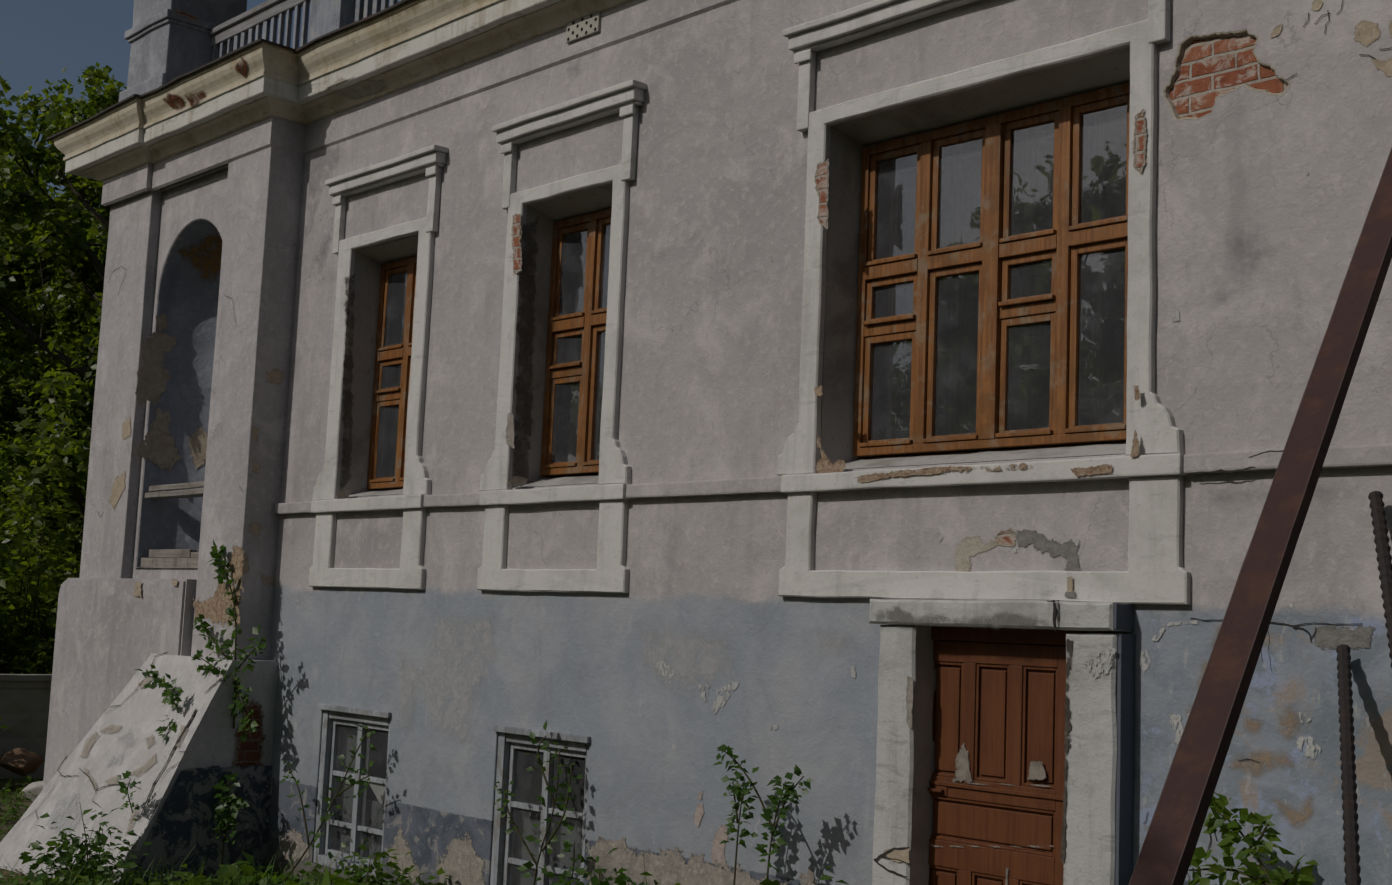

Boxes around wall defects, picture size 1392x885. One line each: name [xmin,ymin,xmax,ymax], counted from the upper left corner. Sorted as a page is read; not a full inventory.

flaking render [1163,24,1290,121]
flaking render [814,159,829,229]
flaking render [511,213,522,275]
peeling [122,314,208,472]
spalling [505,413,514,448]
spalling [815,434,1032,483]
spalling [1071,464,1113,477]
spalling [193,522,275,627]
spalling [954,528,1081,598]
crack [1261,622,1362,662]
spalling [388,827,486,885]
spalling [584,825,817,885]